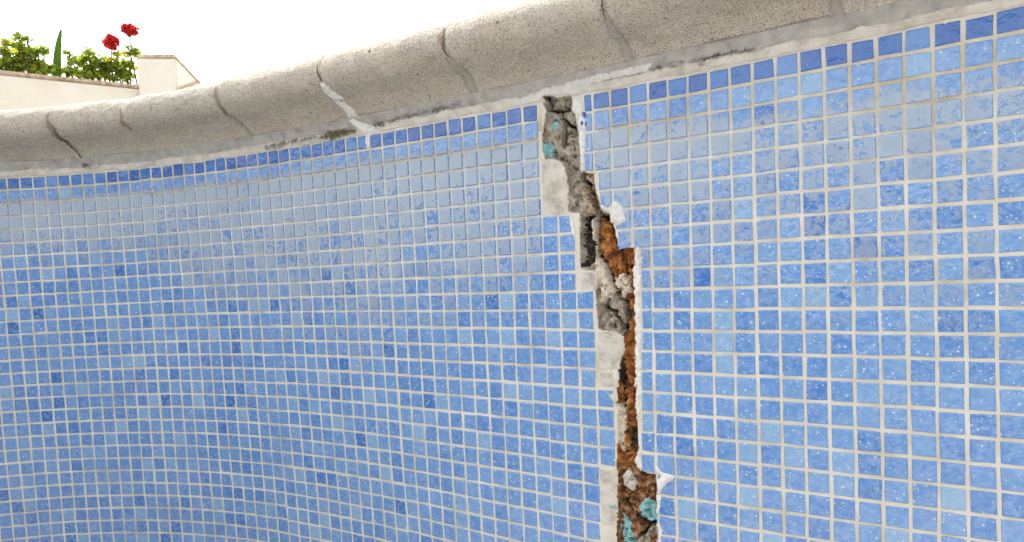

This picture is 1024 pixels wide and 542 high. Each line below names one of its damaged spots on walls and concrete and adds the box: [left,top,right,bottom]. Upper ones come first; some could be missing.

crack [442,29,477,93]
crack [597,0,633,61]
crack [317,65,379,134]
crack [49,122,82,158]
peeling [541,159,569,216]
peeling [598,331,625,406]
peeling [600,469,619,525]